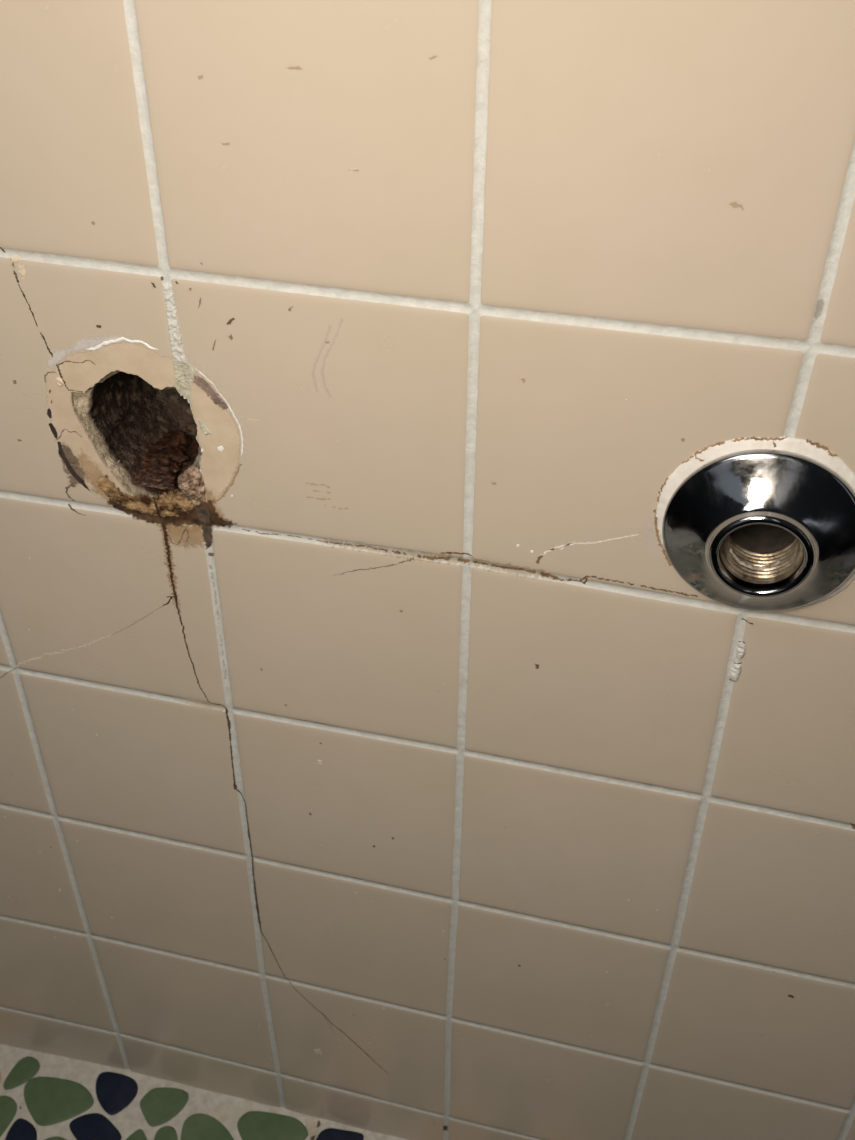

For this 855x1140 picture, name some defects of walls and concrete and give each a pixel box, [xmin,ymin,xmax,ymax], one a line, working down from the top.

crack [0,247,65,382]
spalling [47,377,90,516]
rust [681,437,787,464]
crack [242,529,698,597]
rust [653,478,671,566]
crack [153,497,385,1071]